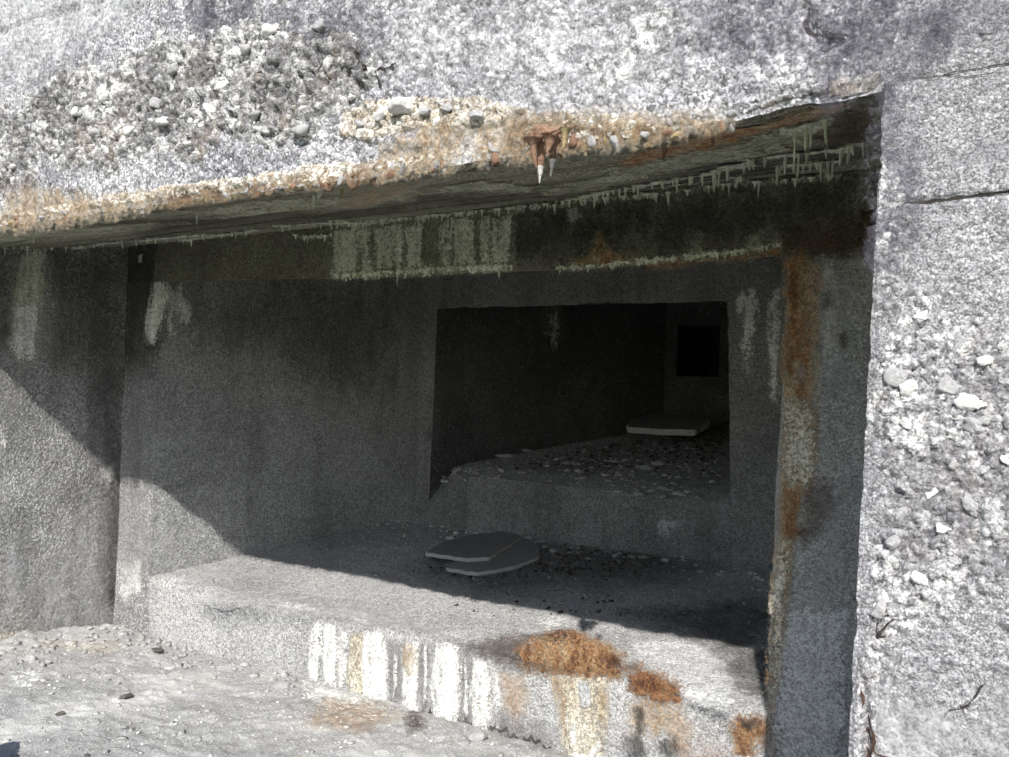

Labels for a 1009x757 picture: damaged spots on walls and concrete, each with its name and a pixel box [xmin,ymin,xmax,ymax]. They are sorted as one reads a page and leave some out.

water stain [0,0,131,91]
water stain [187,0,663,106]
water stain [674,0,964,101]
water stain [0,80,916,379]
crack [904,190,1009,203]
corrosion [570,227,822,757]
water stain [300,620,502,733]
water stain [538,616,569,631]
water stain [551,675,609,757]
corrosion [471,629,690,753]
water stain [625,708,645,757]
water stain [621,601,770,695]